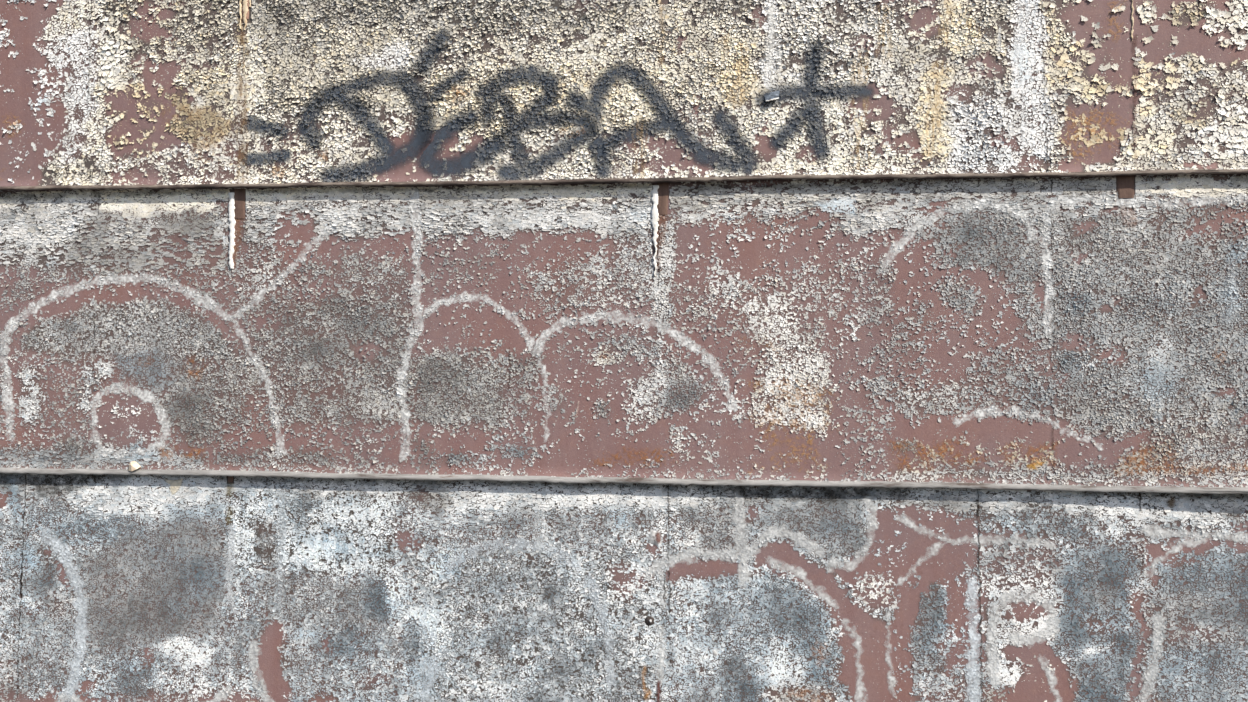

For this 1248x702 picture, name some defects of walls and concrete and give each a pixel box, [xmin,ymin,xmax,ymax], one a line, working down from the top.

peeling [0,14,23,60]
peeling [26,0,1248,186]
peeling [1,120,30,138]